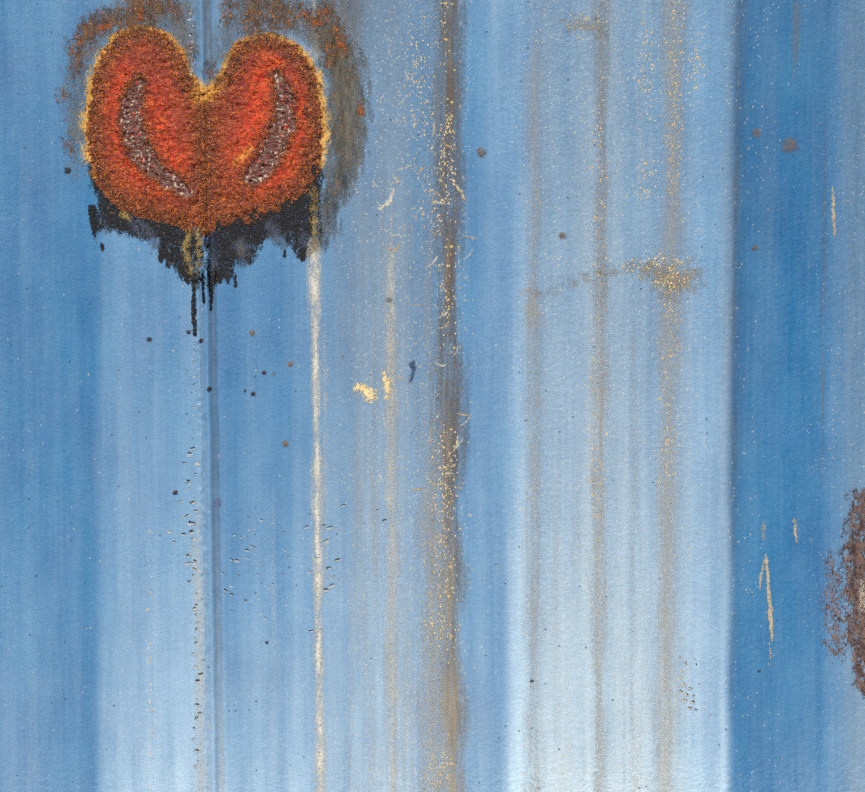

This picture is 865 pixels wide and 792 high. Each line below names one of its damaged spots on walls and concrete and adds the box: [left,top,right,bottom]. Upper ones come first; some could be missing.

corrosion [61,0,351,237]
corrosion [399,0,469,792]
corrosion [821,488,865,699]